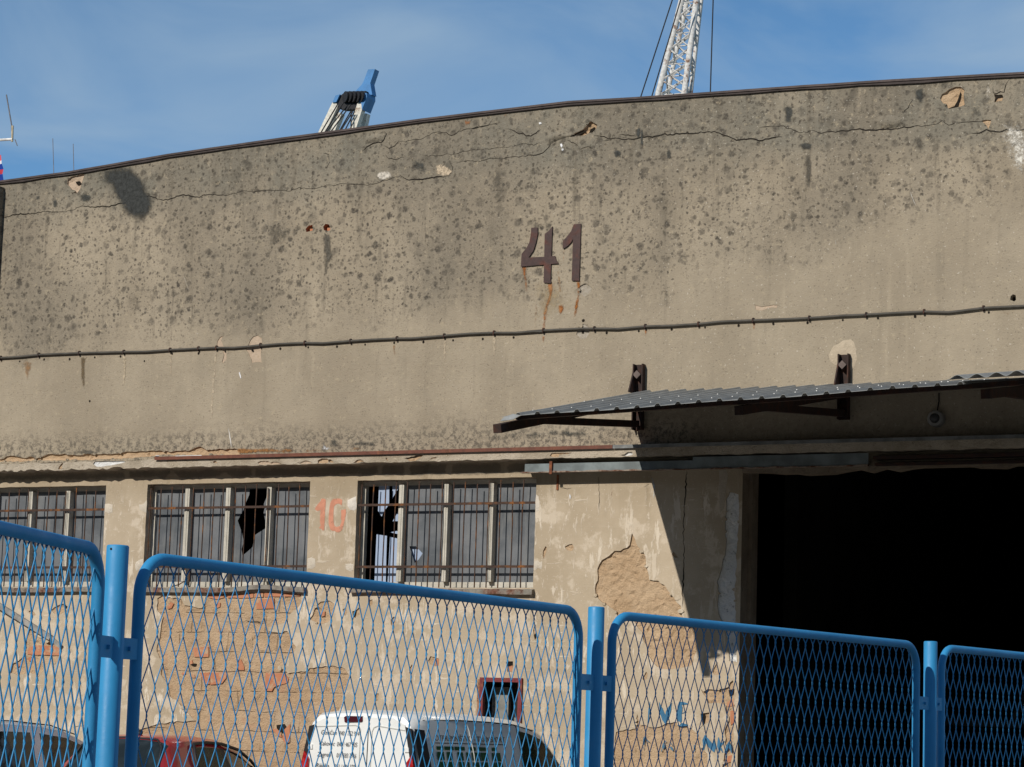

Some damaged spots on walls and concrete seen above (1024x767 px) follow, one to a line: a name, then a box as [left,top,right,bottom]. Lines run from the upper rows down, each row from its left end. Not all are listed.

flaking render [940,87,964,109]
crack [148,101,1024,201]
efflorescence [1007,131,1024,165]
crack [4,203,122,218]
flaking render [67,174,85,194]
water stain [105,169,151,217]
rust [544,282,580,320]
flaking render [246,335,262,363]
flaking render [0,447,241,469]
crack [680,474,688,604]
flaking render [593,534,698,680]
flaking render [139,591,349,767]